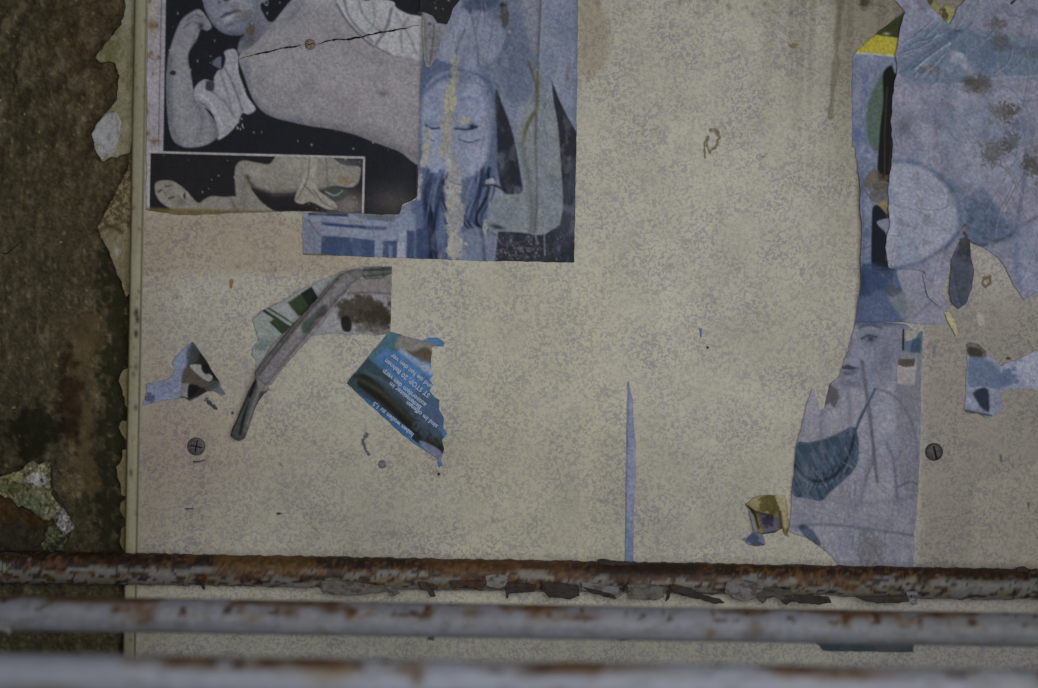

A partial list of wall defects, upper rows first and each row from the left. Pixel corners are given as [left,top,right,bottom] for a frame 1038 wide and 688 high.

peeling [92,0,134,297]
flaking render [0,461,75,552]